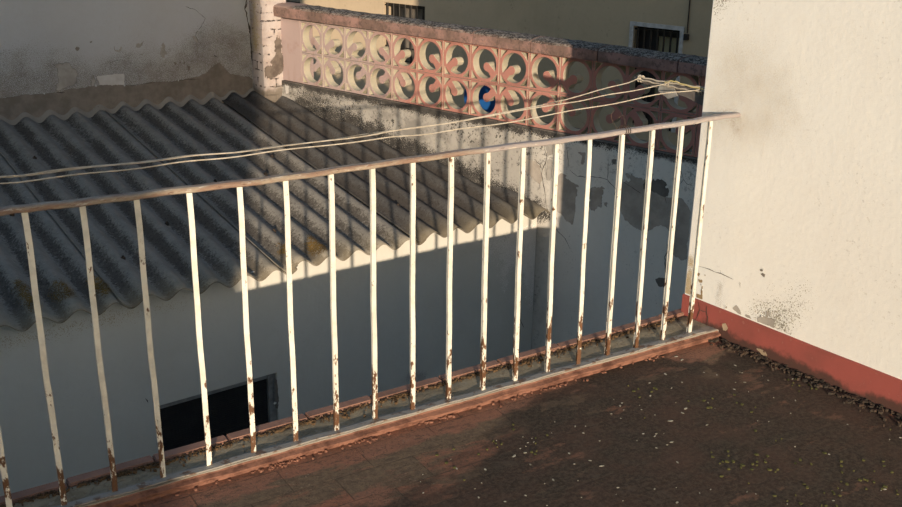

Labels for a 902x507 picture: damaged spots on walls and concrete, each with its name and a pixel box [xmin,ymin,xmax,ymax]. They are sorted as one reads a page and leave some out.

peeling [0,43,253,120]
water stain [0,0,262,98]
spalling [265,32,284,79]
water stain [282,81,697,315]
peeling [526,145,579,227]
peeling [589,184,607,210]
peeling [620,172,691,261]
water stain [750,280,817,335]